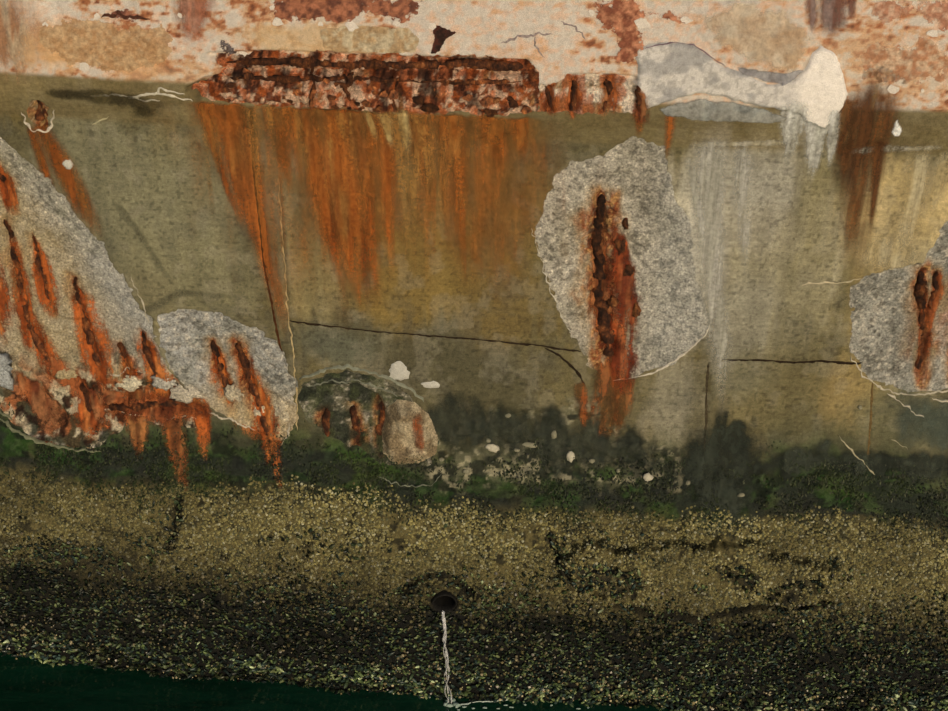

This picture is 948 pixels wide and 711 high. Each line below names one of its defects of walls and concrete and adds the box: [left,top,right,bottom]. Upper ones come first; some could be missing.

spalling [191,0,693,123]
corrosion [28,123,93,223]
spalling [0,137,434,468]
corrosion [197,103,528,287]
crack [249,108,585,430]
spalling [531,136,710,392]
leakage [689,104,839,360]
corrosion [836,85,895,239]
spalling [849,221,948,417]
leakage [859,146,947,230]
leakage [426,390,948,535]
crack [547,535,633,587]